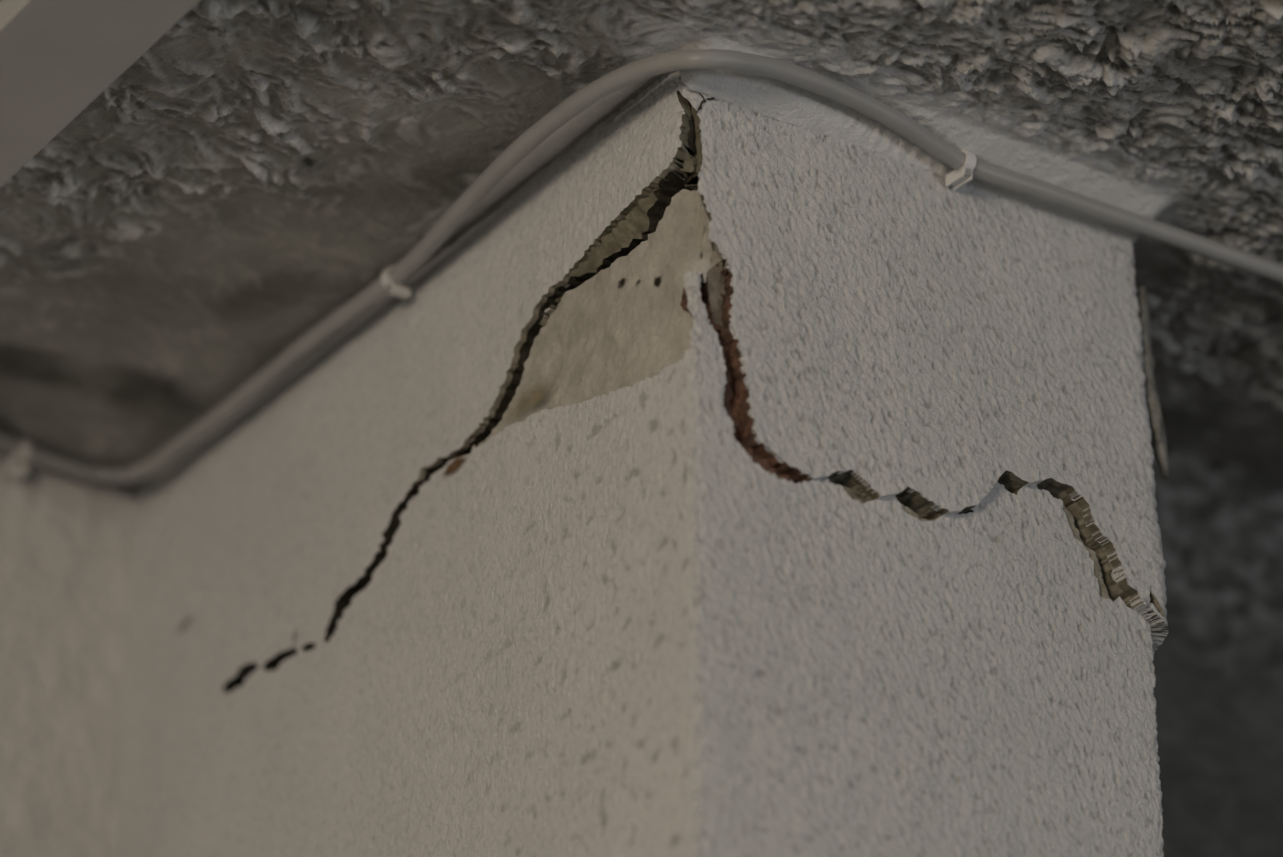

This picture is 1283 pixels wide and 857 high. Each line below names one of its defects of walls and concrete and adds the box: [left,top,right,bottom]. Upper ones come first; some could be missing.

crack [223,90,715,693]
spalling [466,144,731,448]
crack [680,258,975,521]
crack [998,470,1143,611]